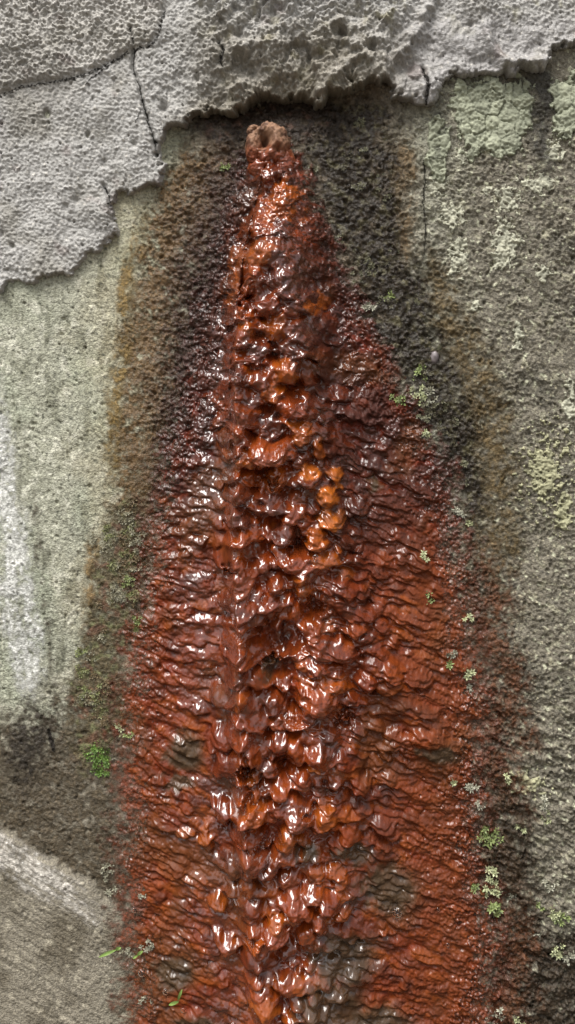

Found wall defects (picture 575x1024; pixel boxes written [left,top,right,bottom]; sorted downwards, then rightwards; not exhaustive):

crack [0,11,166,156]
flaking render [0,0,575,294]
damp [505,71,554,165]
rust [101,121,541,1024]
damp [478,783,575,1024]